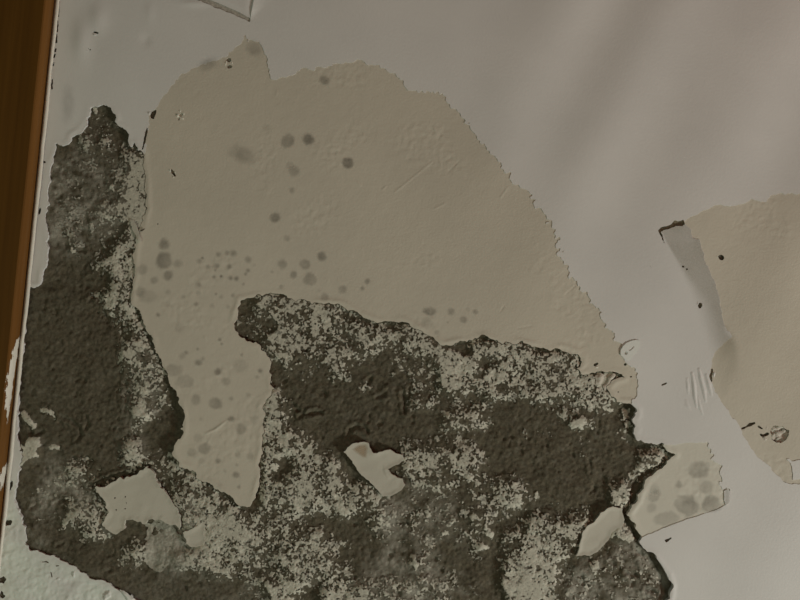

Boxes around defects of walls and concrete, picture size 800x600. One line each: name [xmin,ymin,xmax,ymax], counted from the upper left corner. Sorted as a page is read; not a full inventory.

flaking render [16,105,213,600]
peeling [130,35,730,600]
peeling [683,193,800,484]